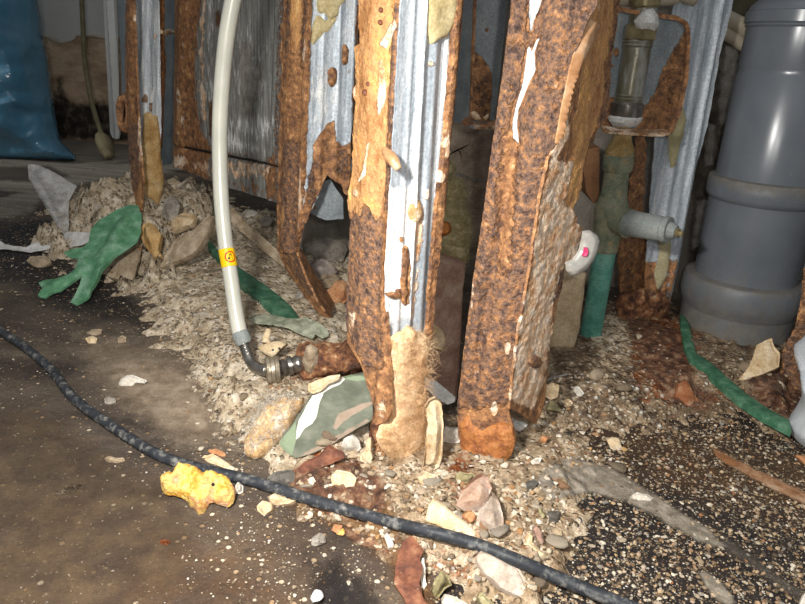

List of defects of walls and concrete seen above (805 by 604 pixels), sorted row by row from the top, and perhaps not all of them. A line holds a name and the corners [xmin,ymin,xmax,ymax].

corrosion [327,44,349,87]
peeling [555,17,601,145]
corrosion [457,0,598,442]
corrosion [627,317,714,411]
corrosion [747,359,798,417]